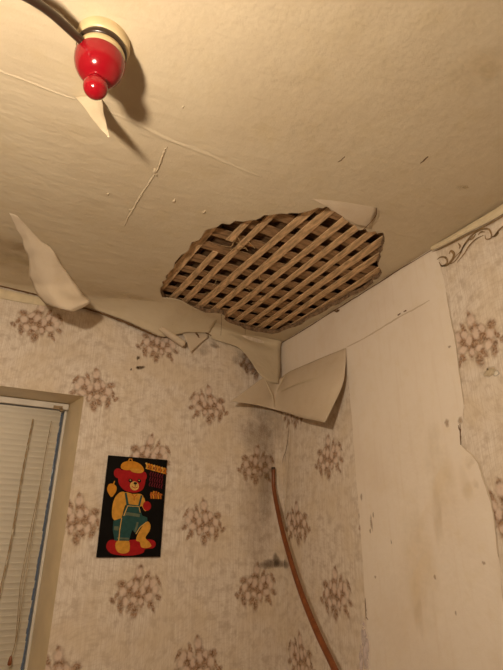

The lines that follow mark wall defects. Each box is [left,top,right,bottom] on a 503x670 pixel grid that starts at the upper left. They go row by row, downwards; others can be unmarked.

crack [124,146,168,226]
peeling [312,199,377,230]
flaking render [191,234,503,670]